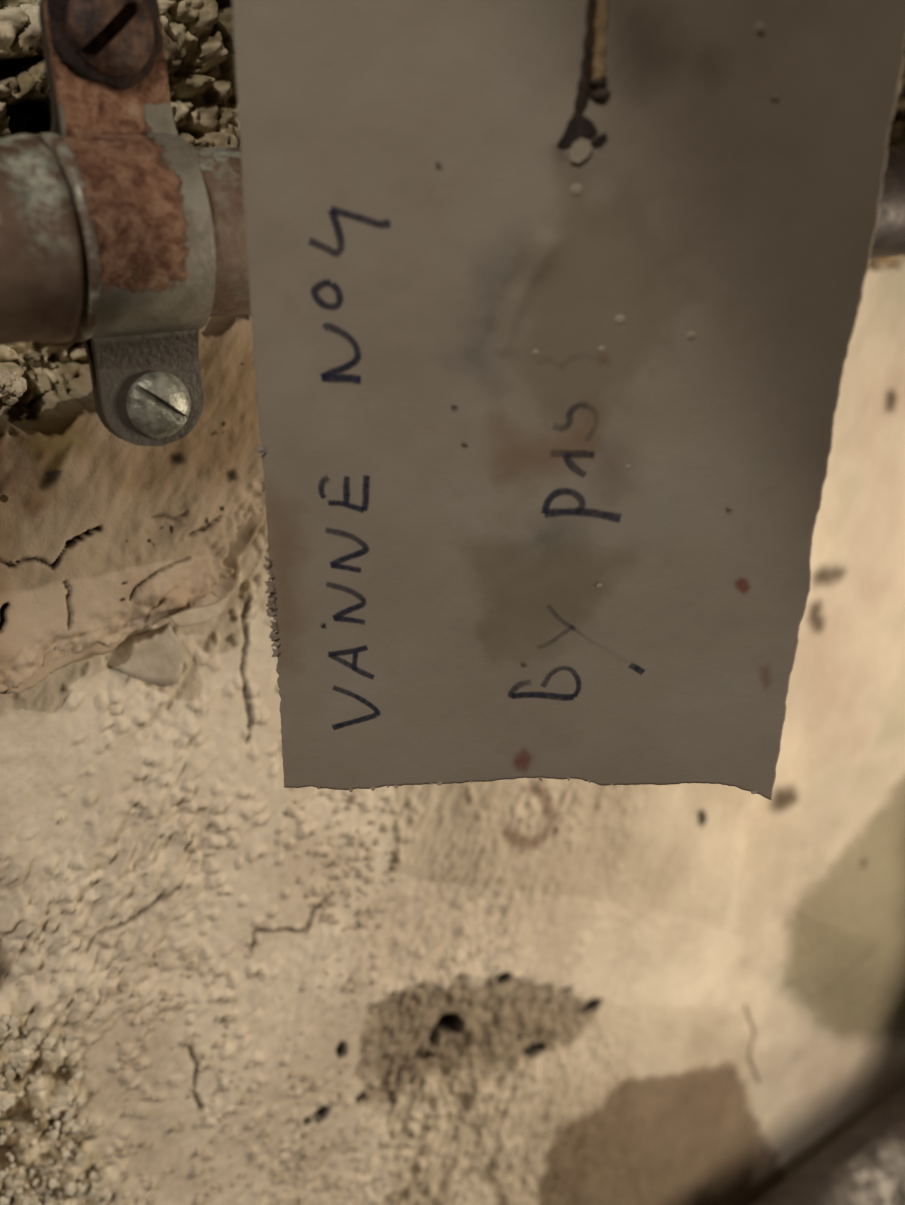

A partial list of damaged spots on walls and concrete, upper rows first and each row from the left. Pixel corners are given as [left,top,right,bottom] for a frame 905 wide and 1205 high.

crack [5,526,99,568]
peeling [0,510,266,694]